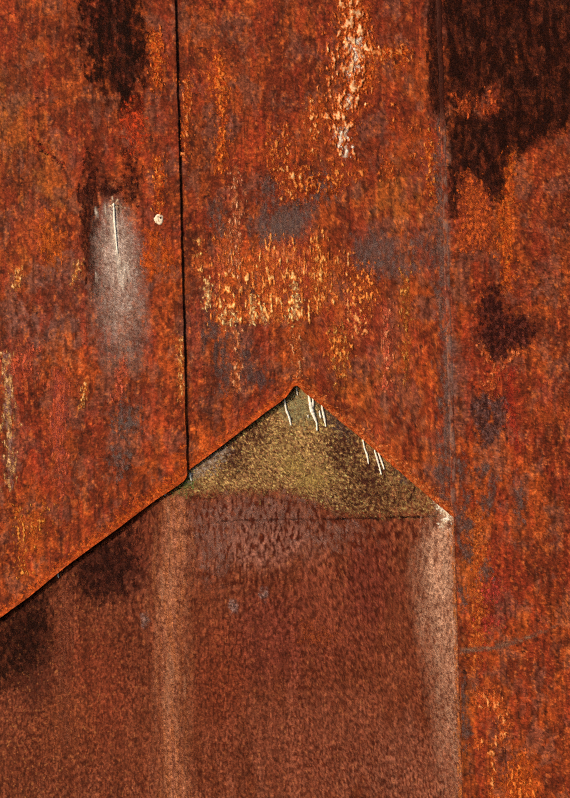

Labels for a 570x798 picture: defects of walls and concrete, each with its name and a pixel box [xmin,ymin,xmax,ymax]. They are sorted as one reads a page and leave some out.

water stain [74,0,154,112]
corrosion [118,22,169,214]
corrosion [265,0,414,206]
water stain [426,0,570,219]
water stain [77,149,143,319]
corrosion [453,152,524,293]
corrosion [0,54,506,698]
corrosion [476,340,520,399]
water stain [472,284,536,362]
corrosion [457,687,537,798]